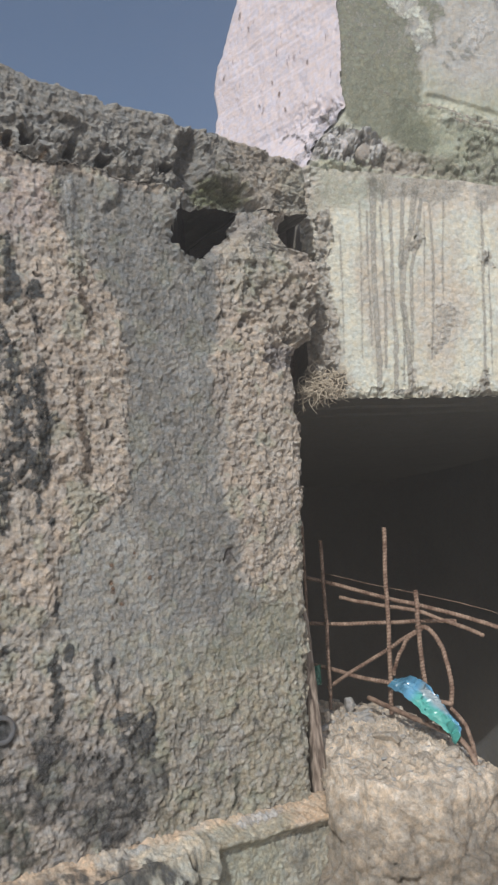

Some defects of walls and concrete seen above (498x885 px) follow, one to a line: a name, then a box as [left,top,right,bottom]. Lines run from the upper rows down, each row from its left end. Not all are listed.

leakage [1,234,44,333]
leakage [64,175,92,340]
spalling [157,129,195,189]
spalling [171,201,186,255]
spalling [233,102,498,184]
leakage [336,0,475,157]
leakage [359,173,472,395]
leakage [480,203,493,386]
leakage [0,322,58,536]
leakage [75,369,92,485]
leakage [0,643,74,868]
leakage [68,680,167,848]